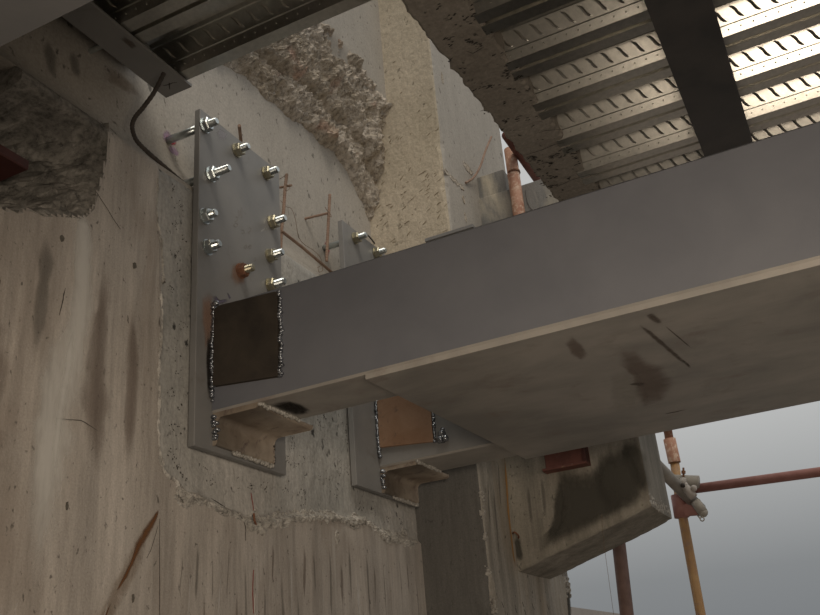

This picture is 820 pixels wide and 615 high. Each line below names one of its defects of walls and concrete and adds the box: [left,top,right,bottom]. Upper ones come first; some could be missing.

spalling [0,67,110,219]
spalling [130,72,185,182]
spalling [223,22,393,221]
spalling [156,173,418,549]
leakage [549,446,647,540]